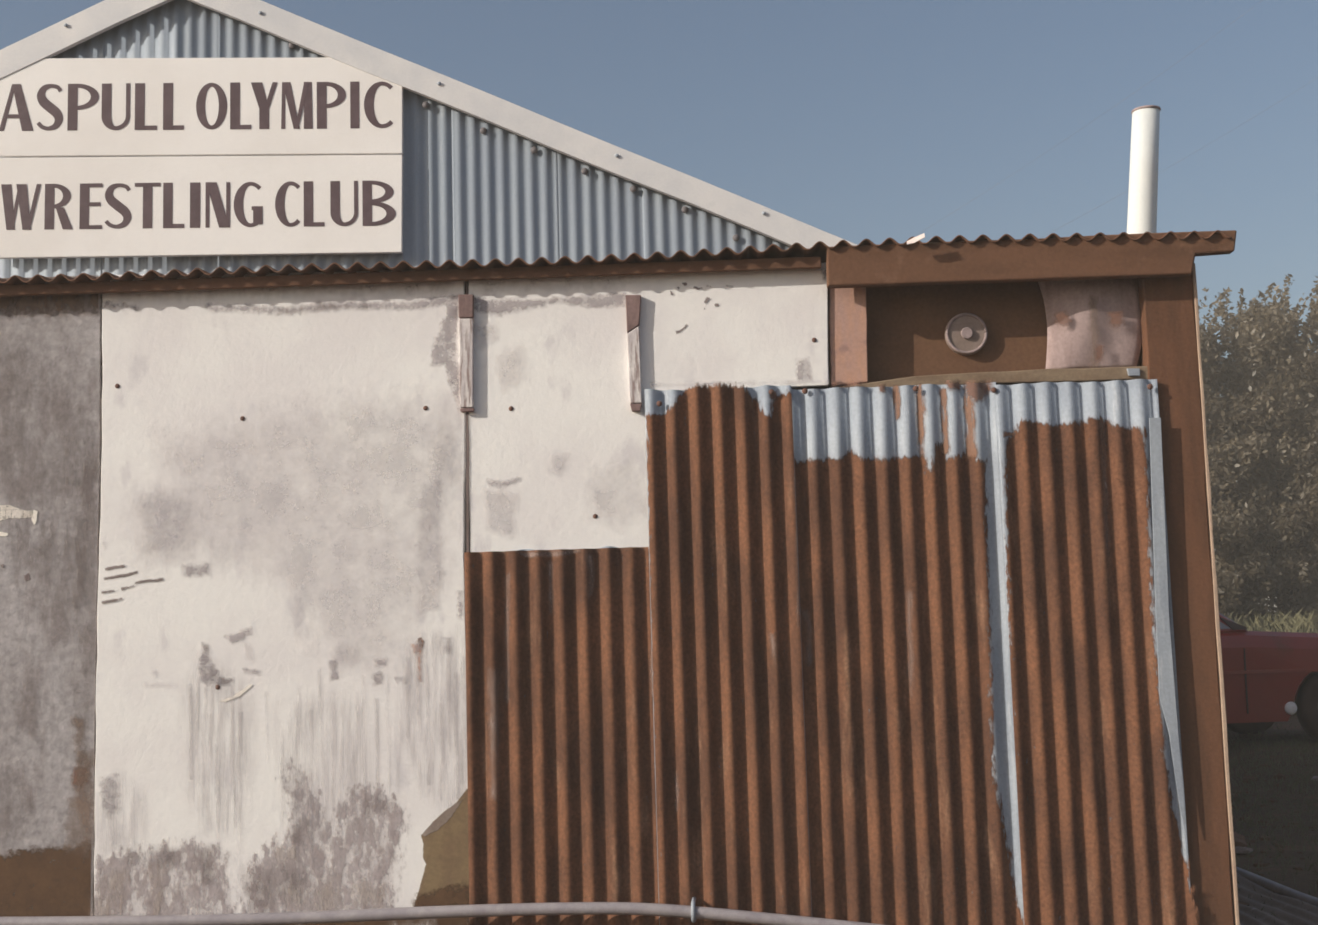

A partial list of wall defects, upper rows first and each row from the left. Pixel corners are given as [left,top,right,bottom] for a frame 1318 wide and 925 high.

leakage [213,296,459,395]
leakage [475,293,625,313]
corrosion [464,380,1199,925]